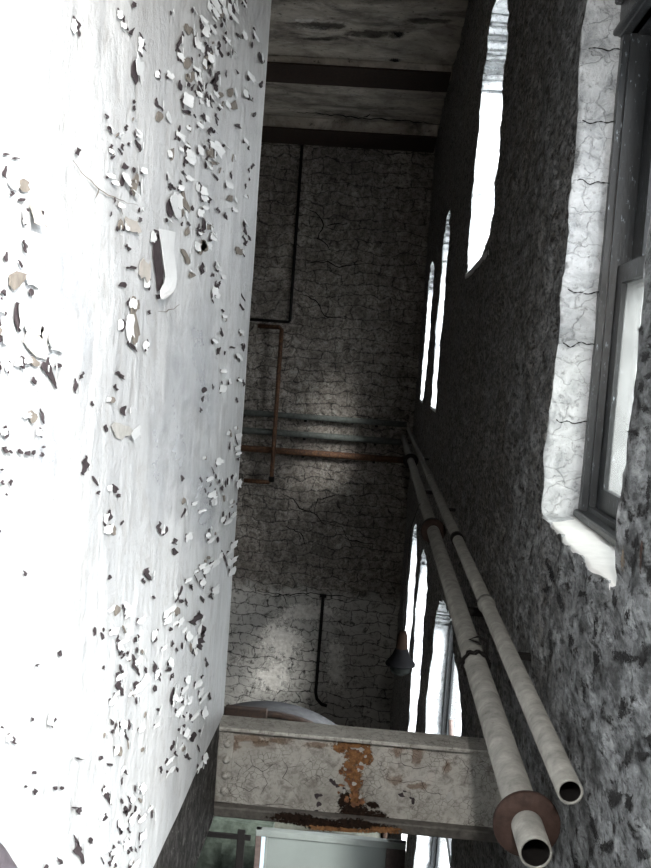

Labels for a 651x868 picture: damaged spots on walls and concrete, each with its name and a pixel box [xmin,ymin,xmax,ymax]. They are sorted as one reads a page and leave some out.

peeling [71,16,81,37]
peeling [0,153,47,227]
peeling [105,0,265,362]
peeling [0,240,69,389]
peeling [1,408,47,457]
peeling [104,371,141,440]
peeling [81,455,121,497]
peeling [93,456,242,785]
corrosion [233,734,290,750]
peeling [72,835,93,864]
peeling [99,782,156,868]
corrosion [265,741,401,835]